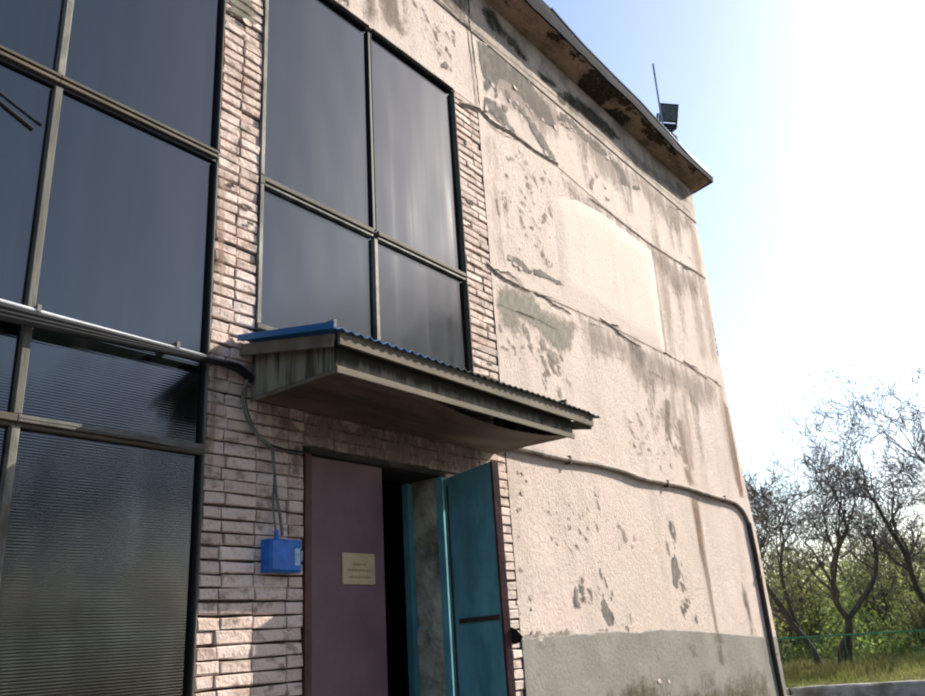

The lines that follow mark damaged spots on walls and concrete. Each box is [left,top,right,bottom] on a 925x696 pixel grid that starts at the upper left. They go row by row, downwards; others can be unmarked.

damp [368,0,401,32]
peeling [413,0,456,71]
crack [435,0,559,166]
peeling [478,42,642,190]
damp [539,73,620,139]
peeling [569,51,679,157]
peeling [496,150,564,286]
damp [629,152,688,201]
damp [497,285,575,362]
crack [487,262,722,389]
peeling [573,569,632,632]
peeling [666,521,698,623]